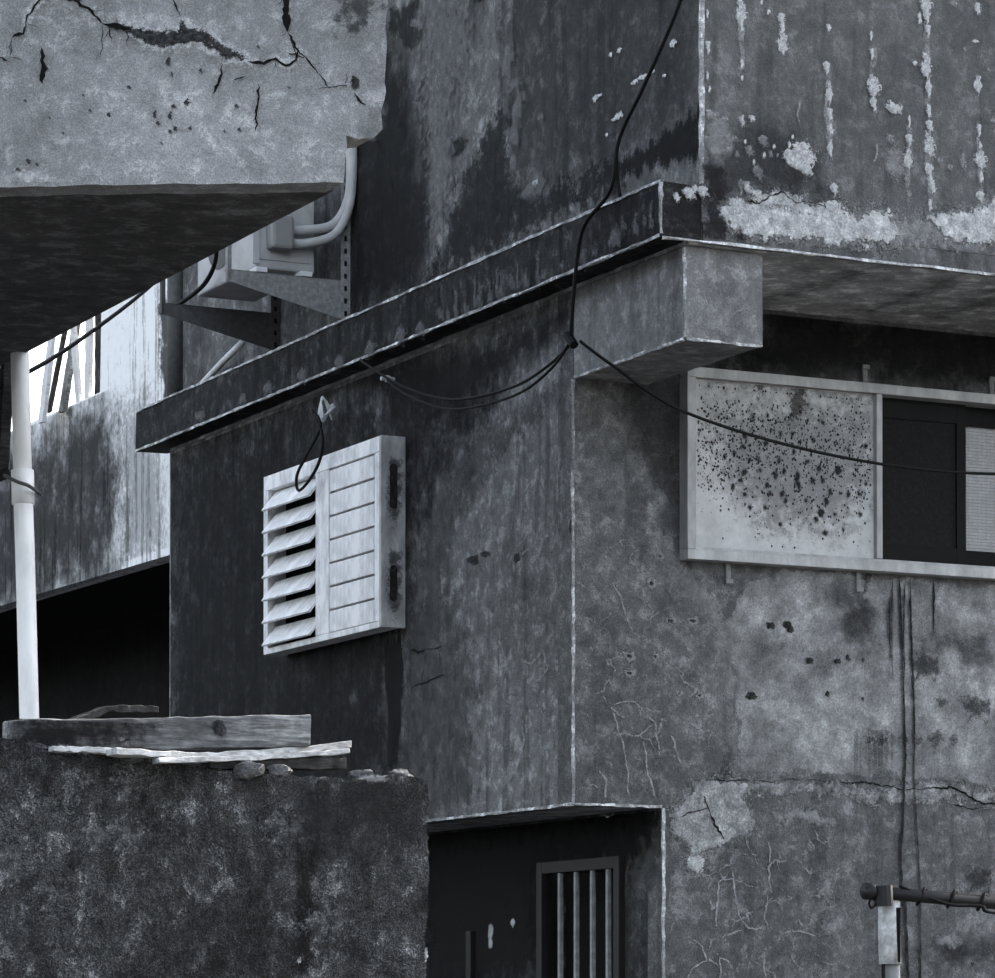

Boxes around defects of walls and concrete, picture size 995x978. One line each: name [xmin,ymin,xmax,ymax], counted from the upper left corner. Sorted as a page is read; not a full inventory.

crack [0,0,131,83]
crack [213,0,366,131]
damp [425,105,744,283]
damp [395,322,425,343]
damp [438,256,546,320]
crack [411,517,722,804]
damp [597,383,995,885]
flaking render [668,772,759,921]
crack [680,826,855,978]
damp [903,901,921,978]